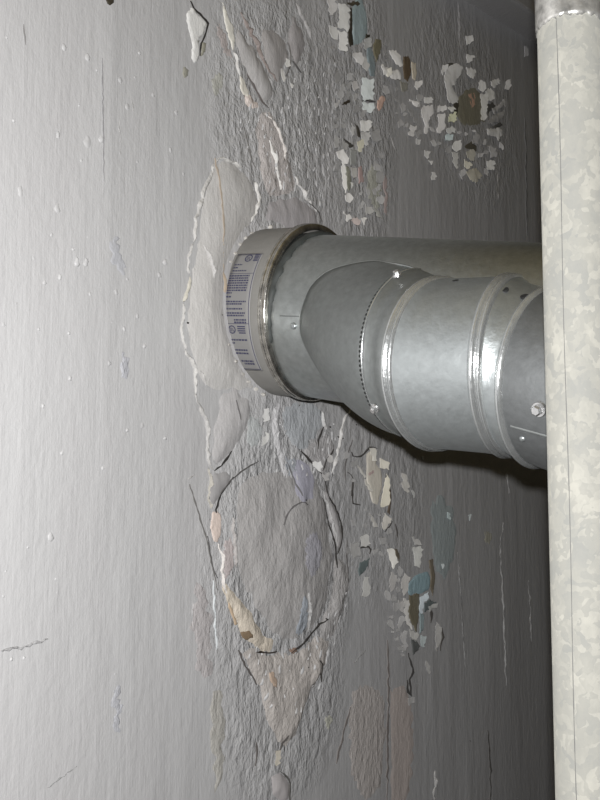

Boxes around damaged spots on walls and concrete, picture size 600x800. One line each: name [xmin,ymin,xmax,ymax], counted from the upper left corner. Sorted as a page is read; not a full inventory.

peeling [182,7,207,78]
peeling [222,3,235,50]
peeling [240,76,249,97]
peeling [327,0,512,225]
peeling [210,511,221,542]
crack [189,451,259,590]
crack [283,427,378,588]
peeling [349,448,445,657]
crack [238,619,329,685]
crack [376,640,414,800]